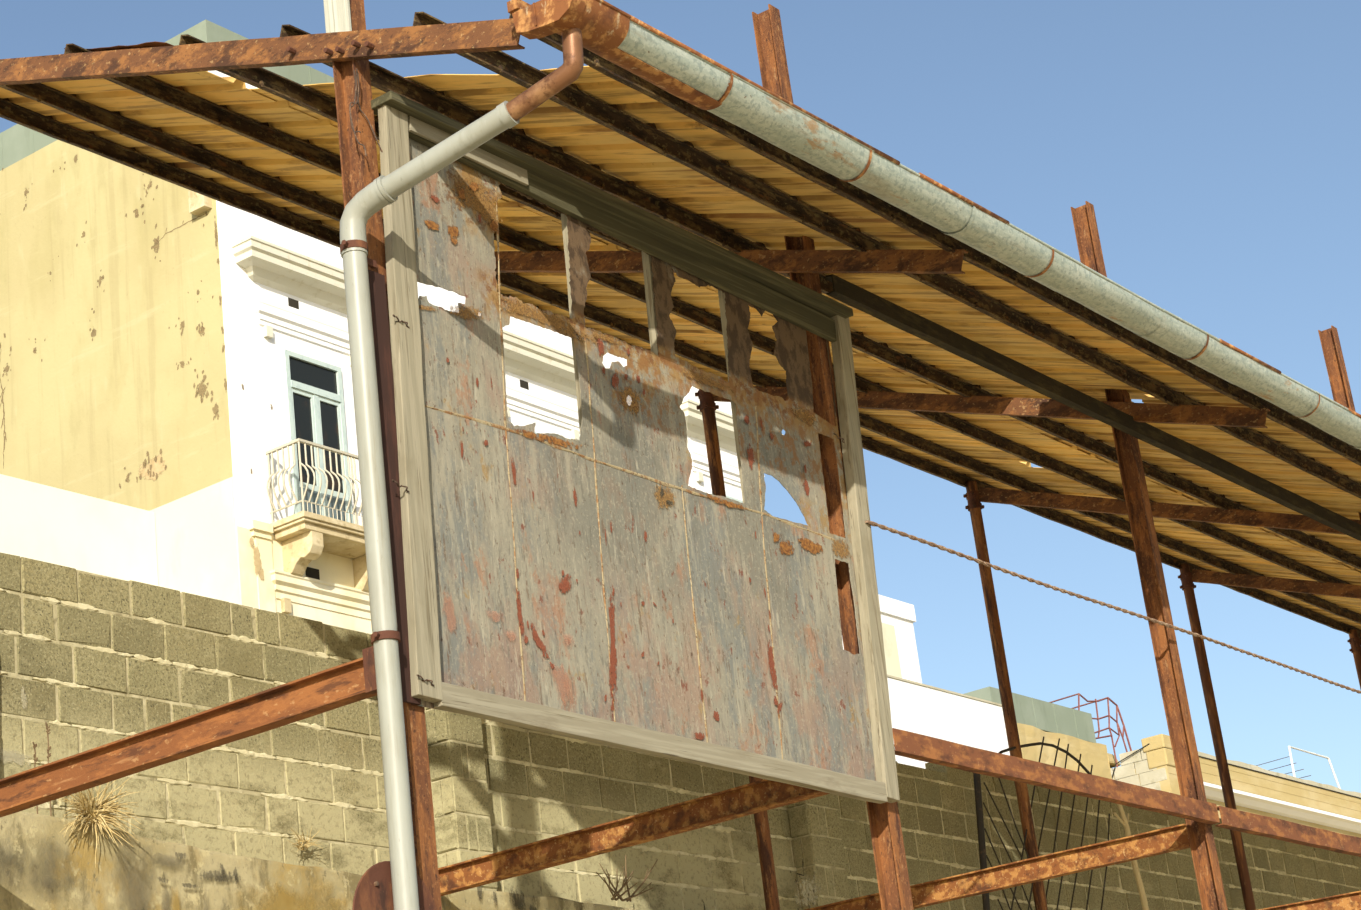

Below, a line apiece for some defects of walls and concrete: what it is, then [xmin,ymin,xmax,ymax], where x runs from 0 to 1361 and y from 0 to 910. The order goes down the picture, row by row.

rust [493,294,621,343]
peeling [597,338,645,394]
crack [0,352,8,468]
rust [619,387,642,415]
rust [512,426,582,449]
rust [654,484,675,508]
rust [700,492,744,509]
rust [774,533,851,558]
peeling [558,570,578,594]
peeling [516,569,555,669]
peeling [604,586,622,715]
peeling [749,577,783,714]